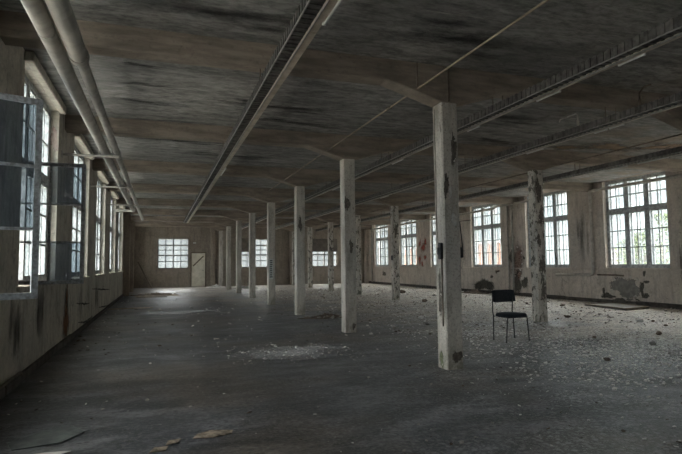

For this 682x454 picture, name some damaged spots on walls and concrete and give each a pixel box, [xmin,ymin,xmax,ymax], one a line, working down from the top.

peeling [535,178,543,225]
flaking render [509,247,523,280]
flaking render [610,275,649,301]